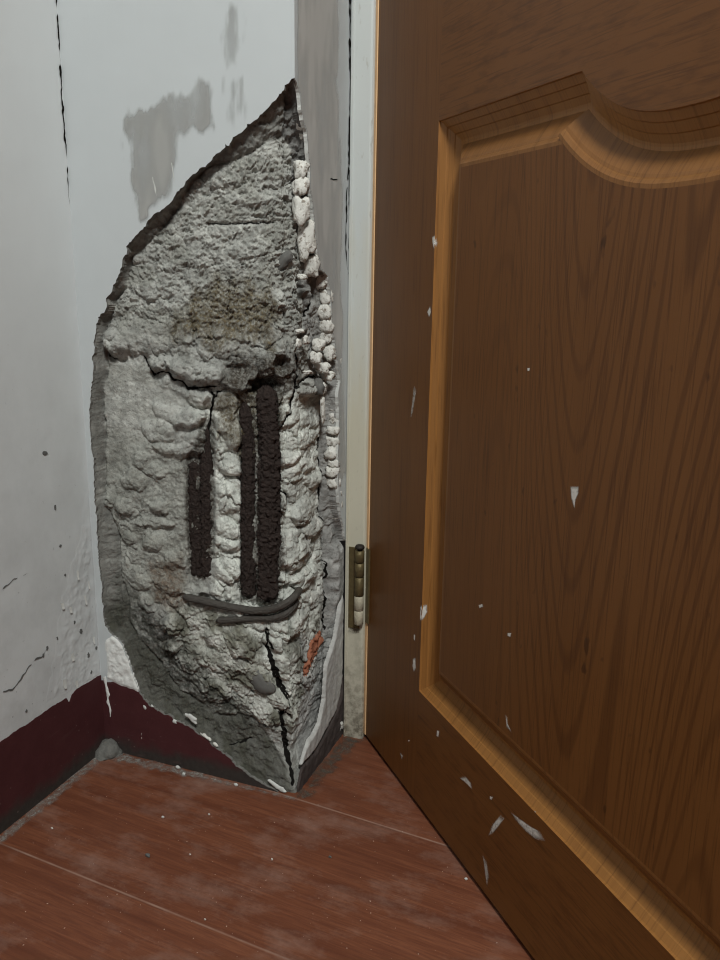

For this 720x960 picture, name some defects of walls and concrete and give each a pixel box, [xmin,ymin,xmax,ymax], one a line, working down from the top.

crack [56,0,70,202]
spalling [90,0,346,793]
rust [172,279,298,602]
crack [3,656,43,692]
crack [264,627,295,786]